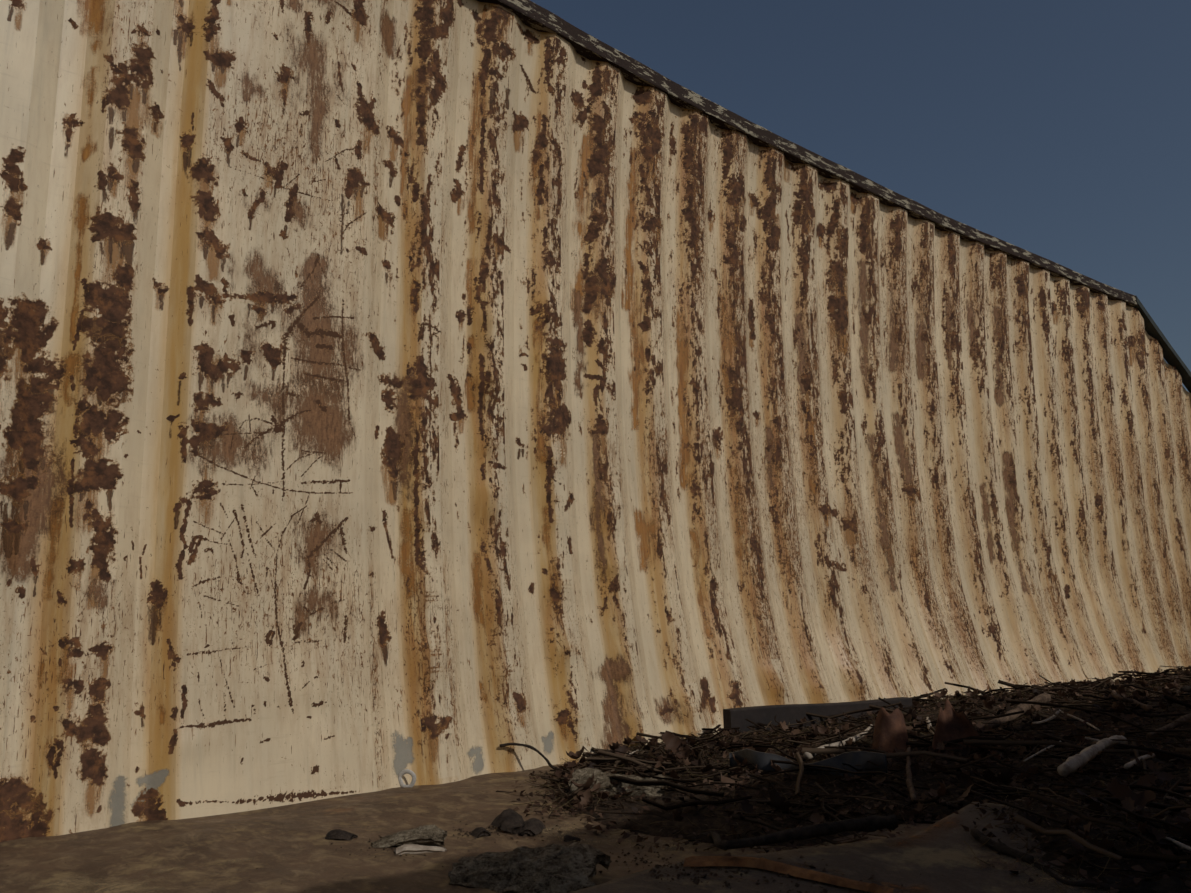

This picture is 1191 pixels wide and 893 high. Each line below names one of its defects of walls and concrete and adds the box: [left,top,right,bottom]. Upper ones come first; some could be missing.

corrosion [166,0,871,603]
corrosion [1013,272,1149,366]
corrosion [892,413,918,506]
corrosion [1002,451,1030,594]
corrosion [375,610,392,666]
corrosion [39,633,113,816]
corrosion [160,685,188,754]
corrosion [420,713,453,762]
corrosion [592,655,641,749]
corrosion [699,677,743,724]
corrosion [0,777,60,842]
corrosion [131,788,186,822]